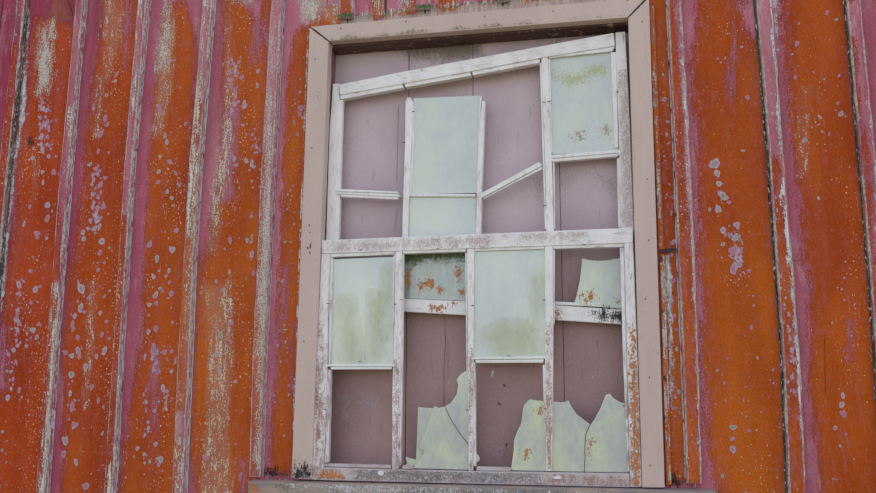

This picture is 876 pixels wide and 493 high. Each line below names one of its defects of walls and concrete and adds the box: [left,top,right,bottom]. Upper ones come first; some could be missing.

peeling [0,0,417,493]
peeling [427,0,495,13]
water stain [588,304,622,323]
peeling [649,0,876,493]